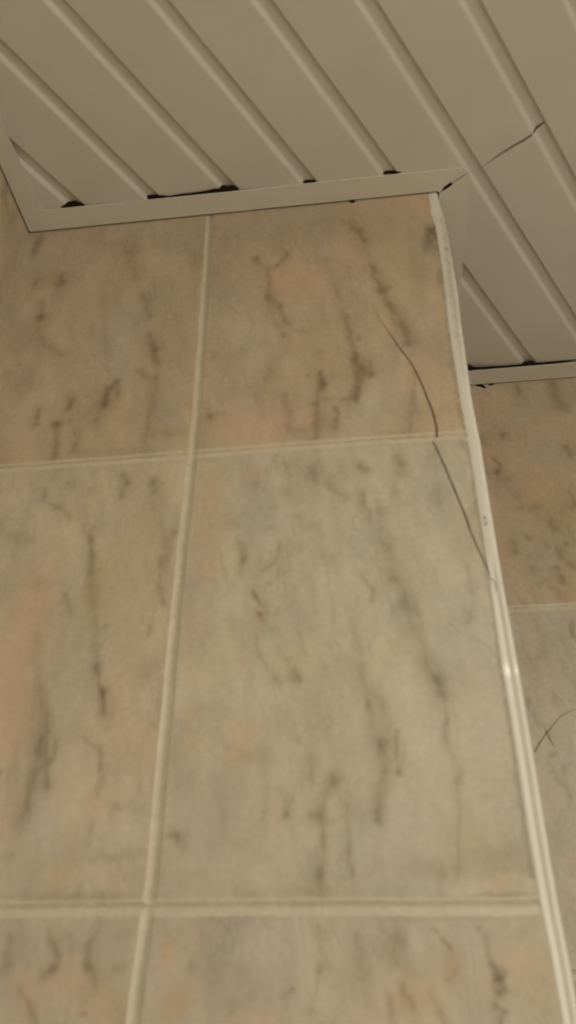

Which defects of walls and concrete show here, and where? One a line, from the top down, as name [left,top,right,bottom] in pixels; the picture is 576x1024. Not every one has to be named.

crack [415,370,467,520]